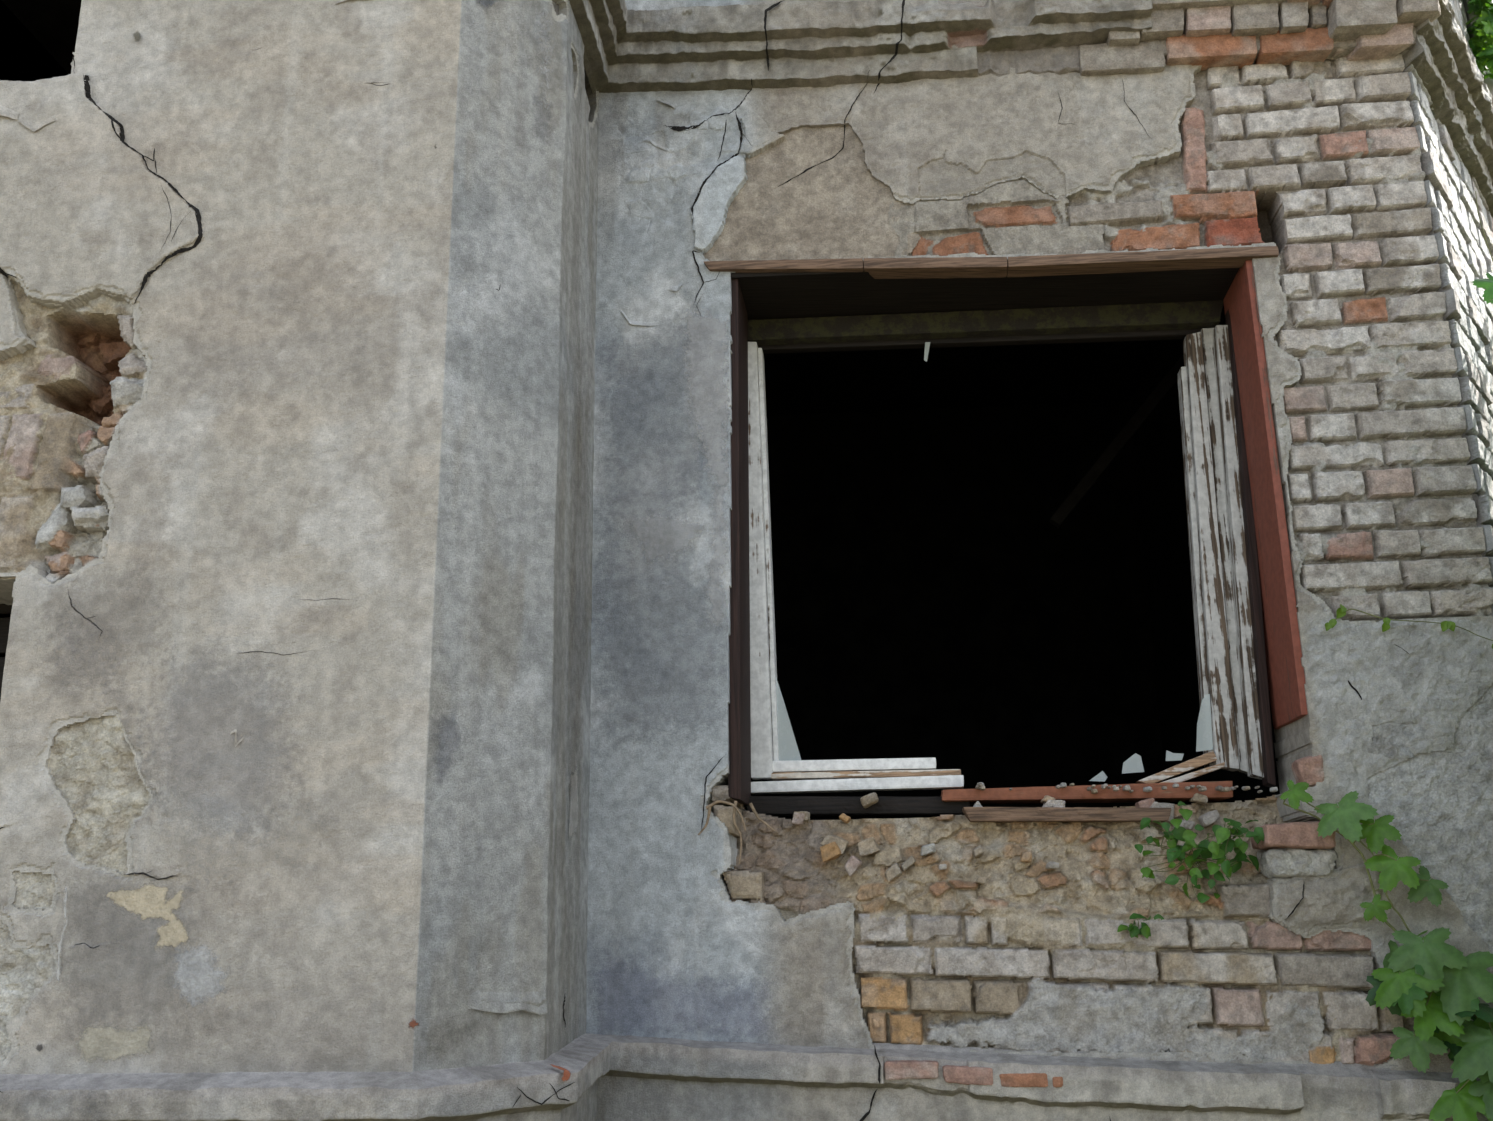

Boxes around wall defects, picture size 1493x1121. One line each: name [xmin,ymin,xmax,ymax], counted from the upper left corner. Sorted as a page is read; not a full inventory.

crack [73,57,203,303]
crack [665,0,784,319]
crack [778,0,905,187]
flaking render [0,283,147,583]
flaking render [690,54,1493,622]
spalling [0,871,57,1062]
spalling [47,715,188,948]
crack [860,1045,881,1121]
flaking render [710,782,1415,1088]
flaking render [1291,755,1324,787]